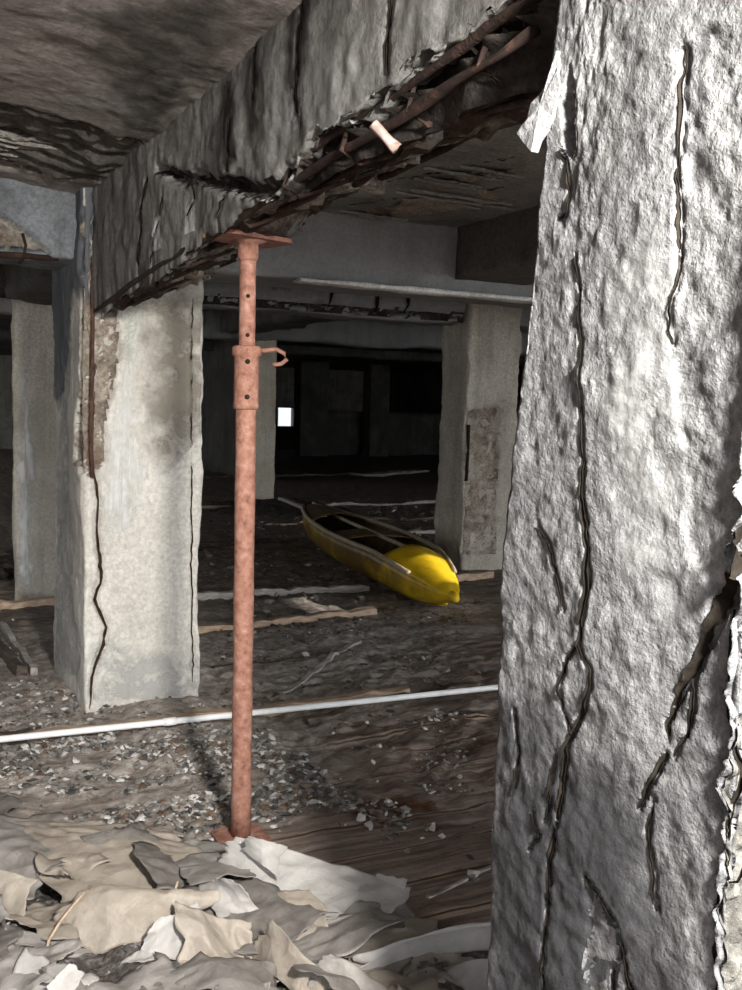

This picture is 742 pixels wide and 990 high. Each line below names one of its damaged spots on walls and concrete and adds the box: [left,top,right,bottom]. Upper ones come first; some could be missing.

spalling [0,102,142,183]
damp [98,1,222,122]
damp [218,84,236,170]
damp [246,0,359,140]
spalling [72,0,561,478]
crack [667,44,689,344]
crack [89,476,107,709]
crack [529,256,591,990]
spalling [582,893,631,990]
crack [584,876,634,990]
crack [639,525,742,990]
spalling [717,716,742,990]